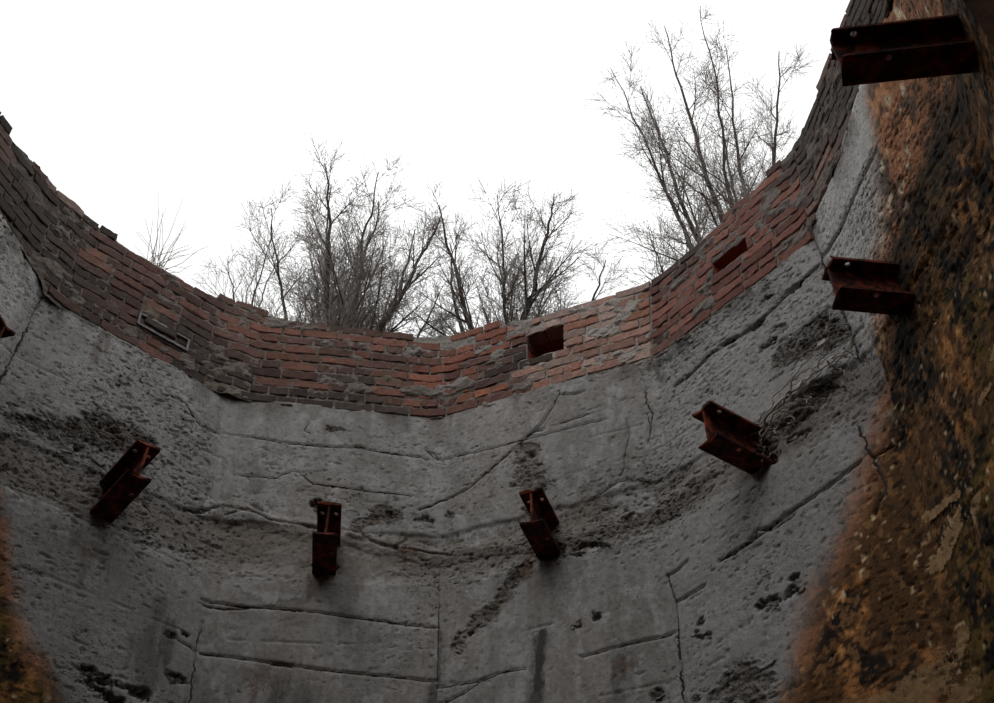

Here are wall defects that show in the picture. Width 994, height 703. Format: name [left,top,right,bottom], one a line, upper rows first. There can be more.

crack [814,236,864,361]
spalling [752,306,857,381]
spalling [757,377,847,466]
spalling [77,664,152,703]
spalling [164,669,189,685]
leakage [529,628,547,703]
crack [668,561,704,703]